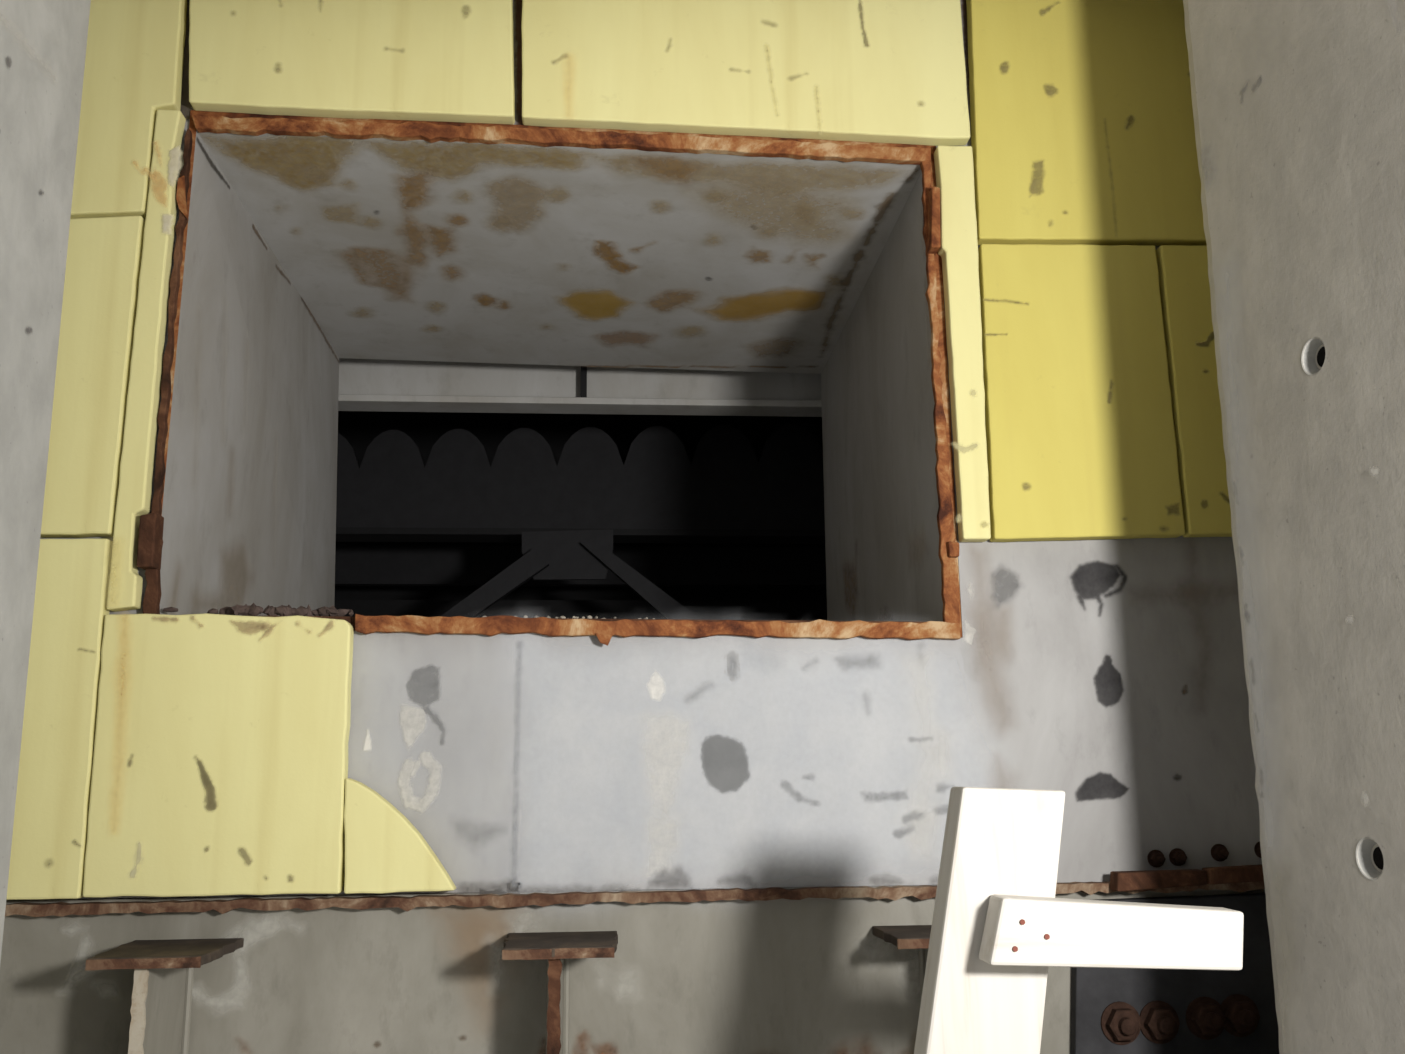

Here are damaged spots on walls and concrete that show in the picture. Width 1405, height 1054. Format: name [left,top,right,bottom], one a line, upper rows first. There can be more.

corrosion [134,0,961,640]
corrosion [961,0,971,121]